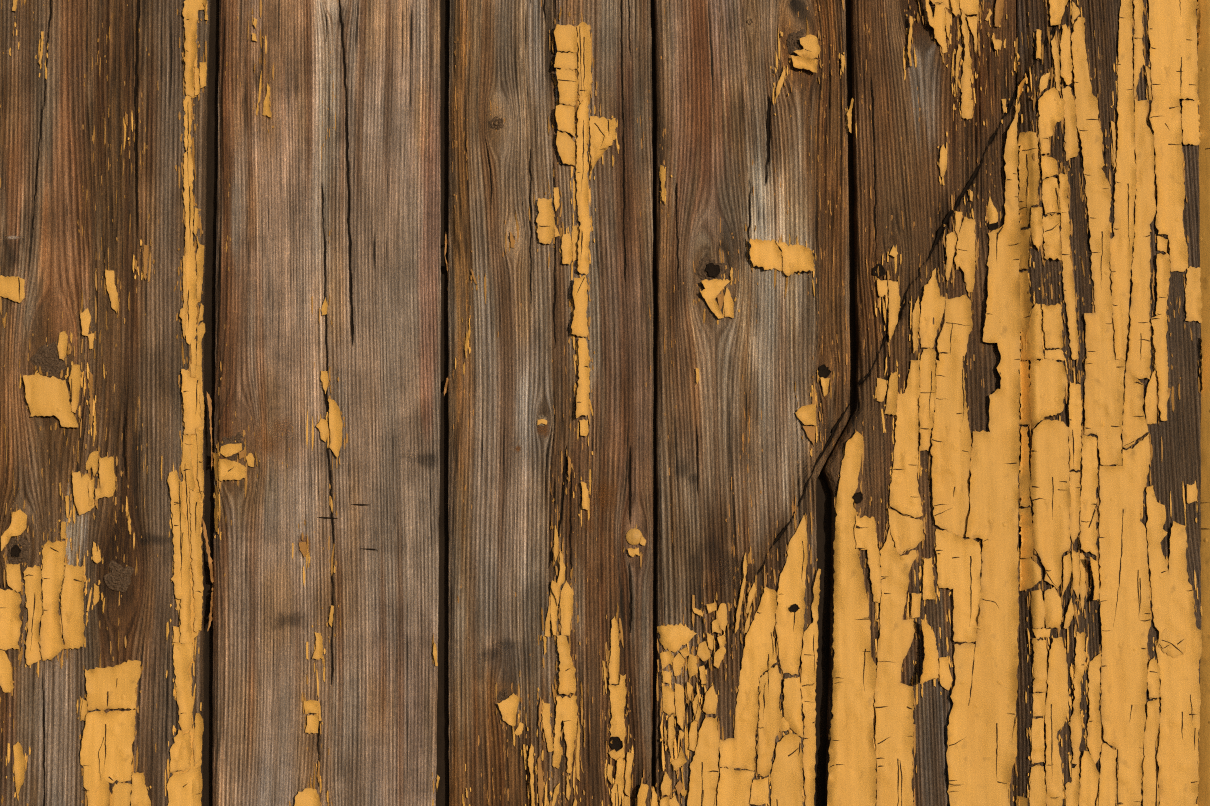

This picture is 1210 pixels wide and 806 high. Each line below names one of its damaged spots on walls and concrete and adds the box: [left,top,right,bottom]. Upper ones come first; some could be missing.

peeling [1,728,31,806]
peeling [0,239,155,704]
peeling [76,0,260,806]
peeling [289,760,329,806]
crack [322,0,354,684]
peeling [495,521,585,806]
peeling [505,6,619,528]
crack [620,0,631,282]
crack [626,444,634,525]
crack [626,563,634,633]
crack [633,0,1070,805]
peeling [601,0,1210,806]